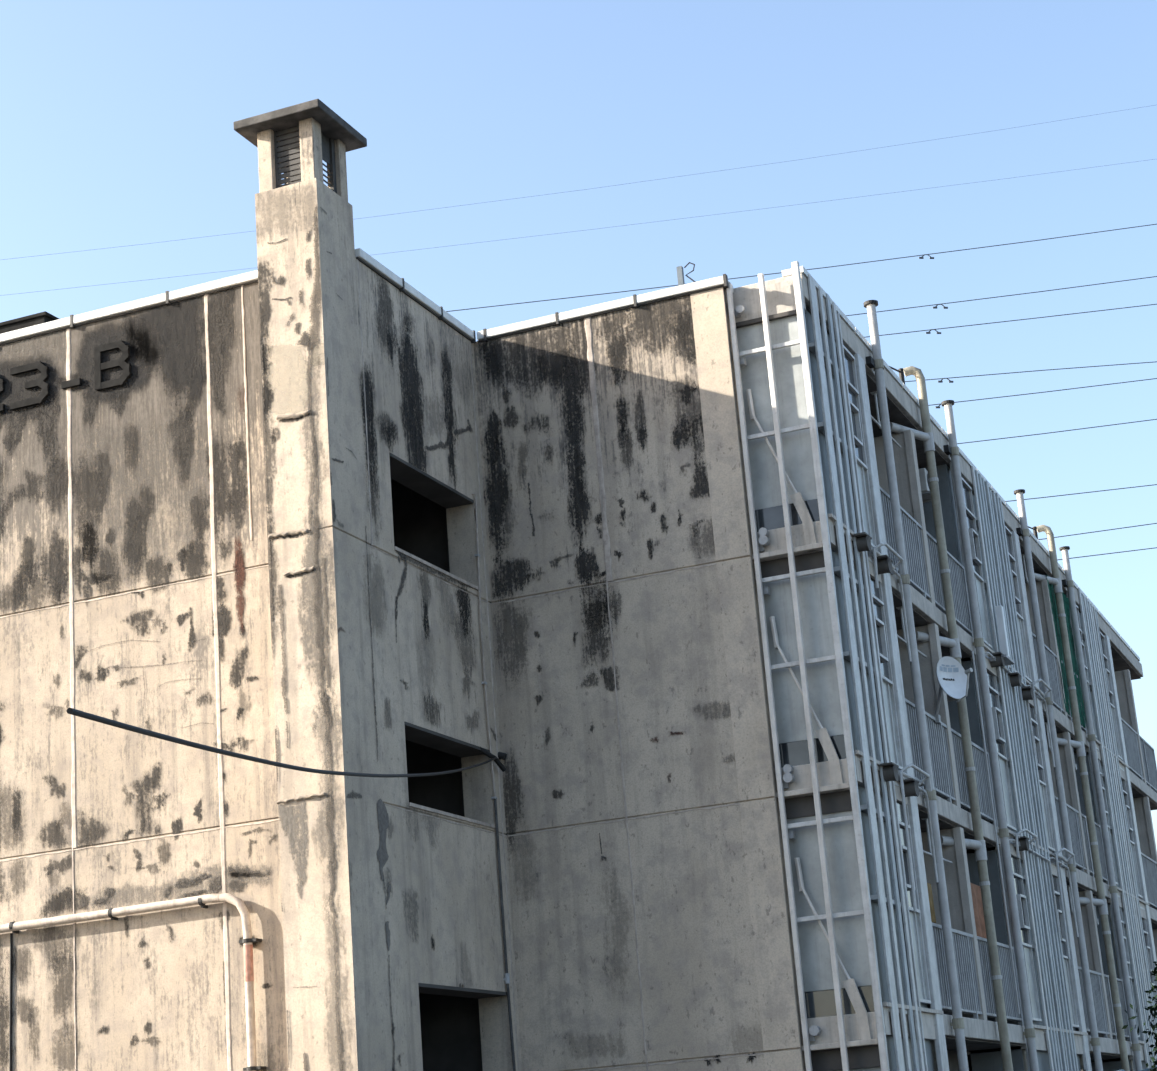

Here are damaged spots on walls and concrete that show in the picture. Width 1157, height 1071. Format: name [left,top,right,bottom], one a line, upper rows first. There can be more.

damp [257,262,274,418]
damp [0,288,258,688]
damp [271,415,303,441]
damp [360,277,427,524]
damp [441,348,458,490]
damp [478,295,696,691]
damp [673,383,710,498]
rust [233,538,245,632]
damp [12,791,21,830]
damp [39,811,109,875]
damp [122,763,170,871]
damp [42,888,82,915]